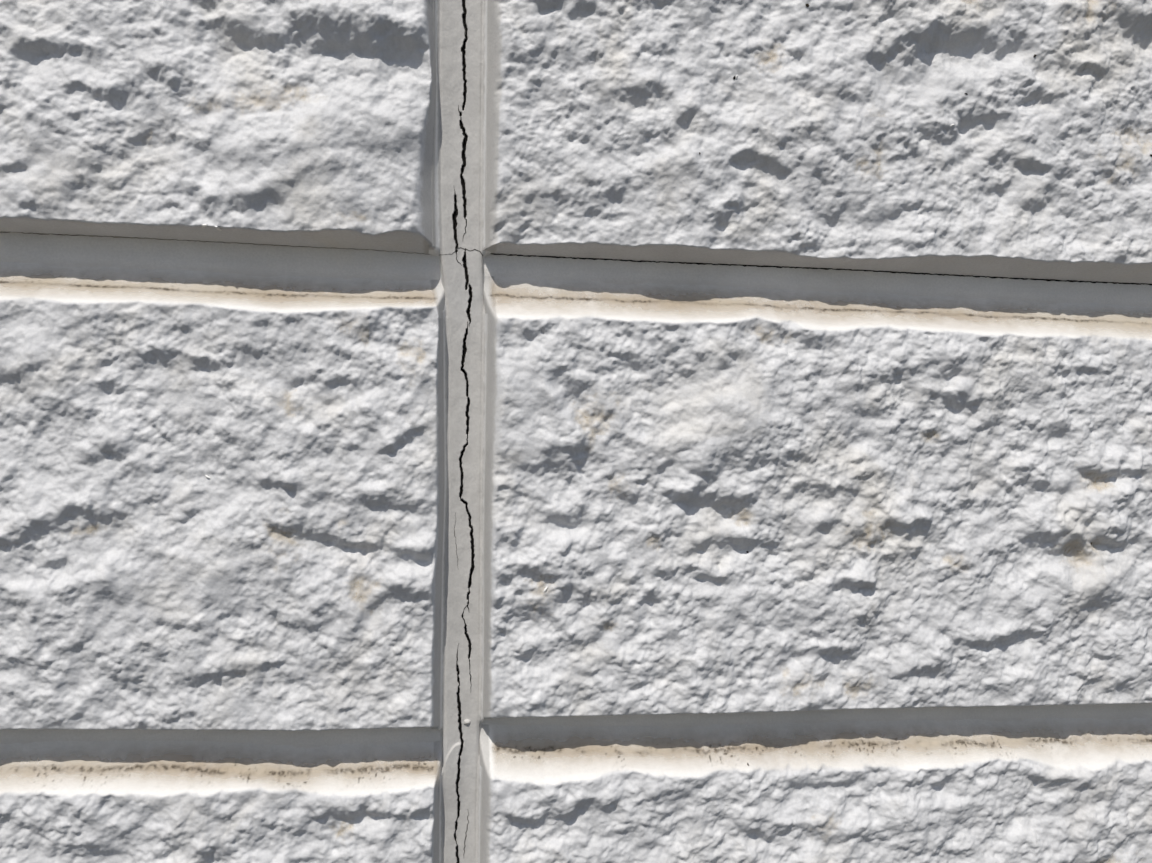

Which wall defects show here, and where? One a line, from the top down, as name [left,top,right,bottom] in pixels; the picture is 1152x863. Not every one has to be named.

crack [440,0,1152,863]